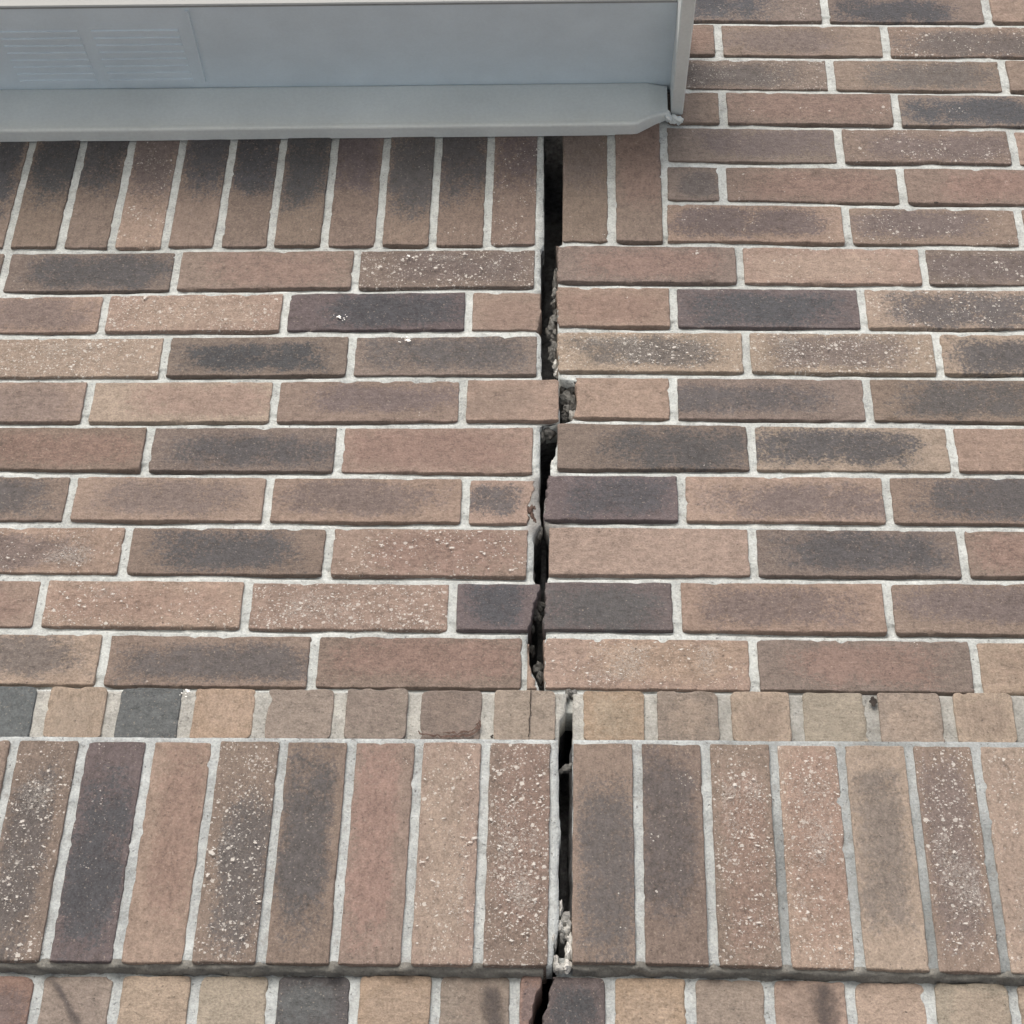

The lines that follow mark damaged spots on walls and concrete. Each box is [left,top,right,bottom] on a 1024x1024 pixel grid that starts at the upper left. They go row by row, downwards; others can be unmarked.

crack [527,137,578,737]
crack [533,732,573,1024]